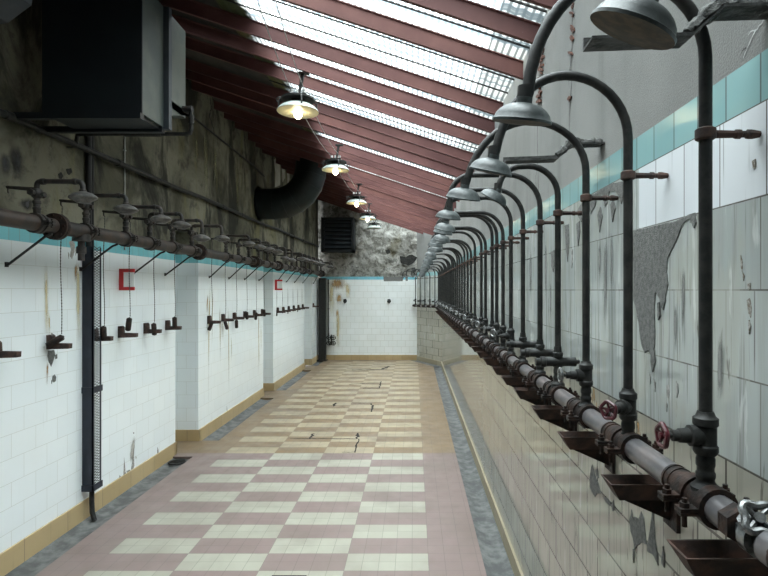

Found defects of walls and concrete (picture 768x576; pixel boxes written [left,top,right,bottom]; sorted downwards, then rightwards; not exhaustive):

corrosion [331,280,348,330]
spalling [633,212,697,392]
spalling [47,350,57,384]
crack [290,433,360,453]
spalling [590,464,617,512]
spalling [629,510,665,568]